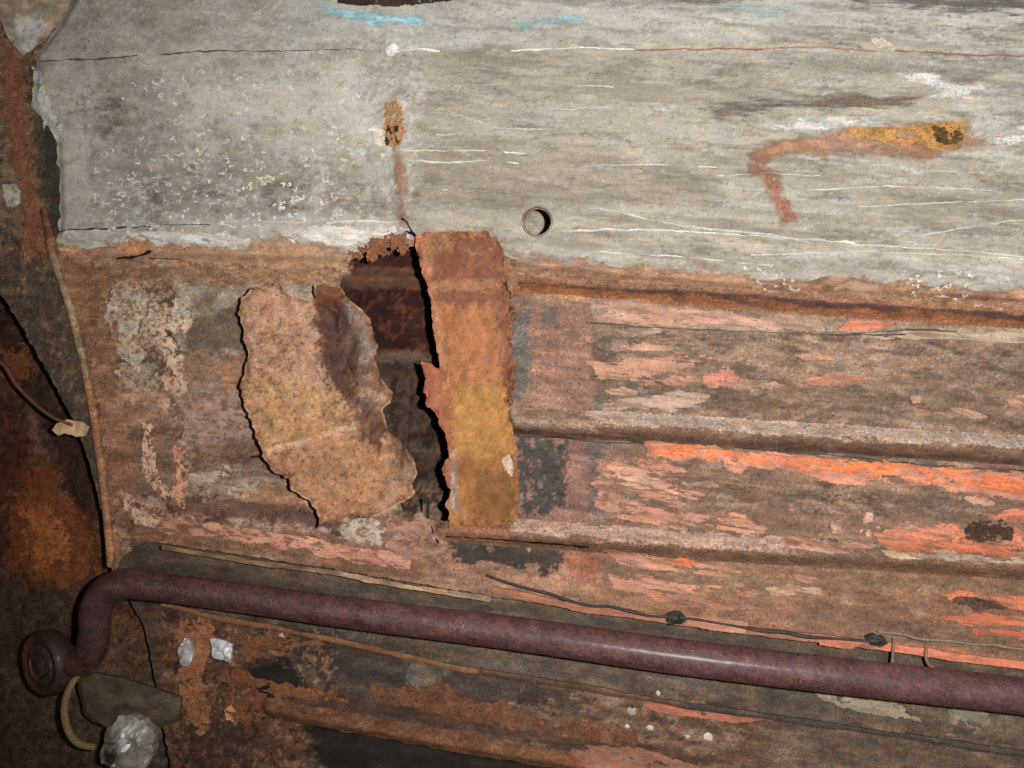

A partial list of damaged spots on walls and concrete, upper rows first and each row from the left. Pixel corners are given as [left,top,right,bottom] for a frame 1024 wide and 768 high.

crack [41,48,364,62]
rust [93,98,410,278]
peeling [277,225,397,247]
rust [749,119,986,223]
rust [0,341,42,385]
peeling [586,299,823,412]
peeling [838,320,1024,343]
rust [0,452,106,601]
peeling [104,288,448,570]
peeling [502,454,514,477]
peeling [590,440,1024,565]
rust [174,616,349,736]